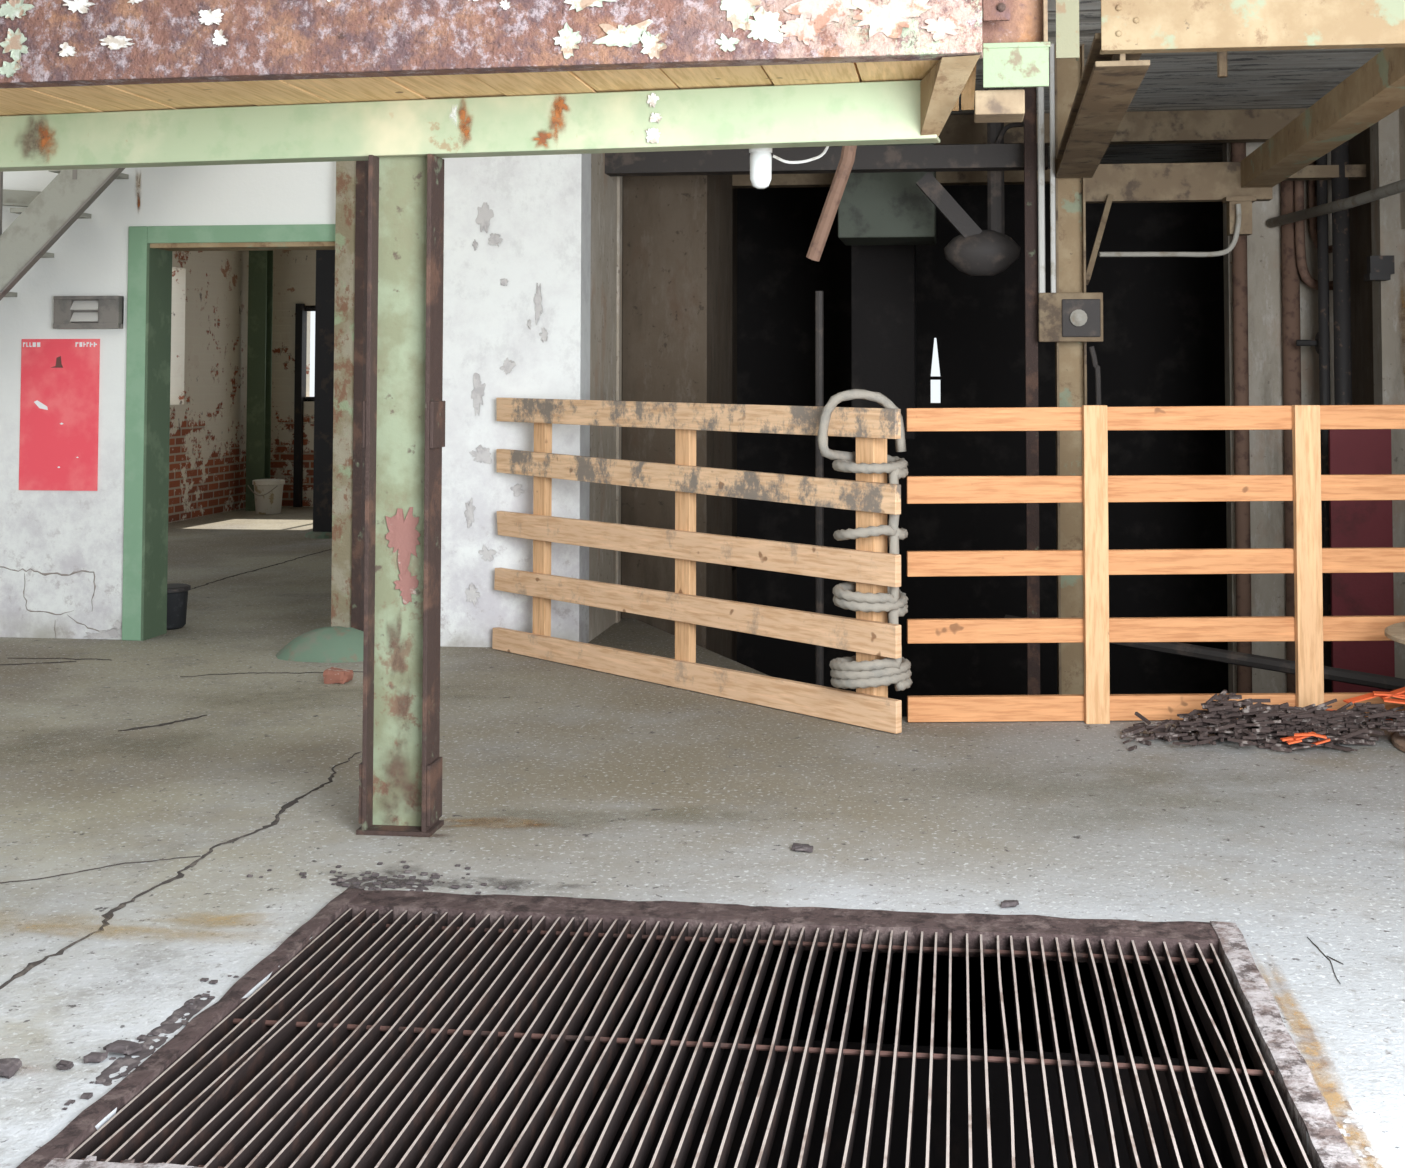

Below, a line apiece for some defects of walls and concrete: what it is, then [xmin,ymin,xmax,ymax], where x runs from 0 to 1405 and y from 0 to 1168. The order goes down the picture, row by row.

peeling [0,0,34,78]
peeling [58,42,77,57]
peeling [63,0,95,14]
peeling [100,35,135,50]
peeling [198,9,228,46]
peeling [553,0,667,59]
corrosion [23,121,53,154]
corrosion [534,98,569,147]
peeling [385,507,421,605]
corrosion [390,623,403,668]
crack [0,751,362,989]